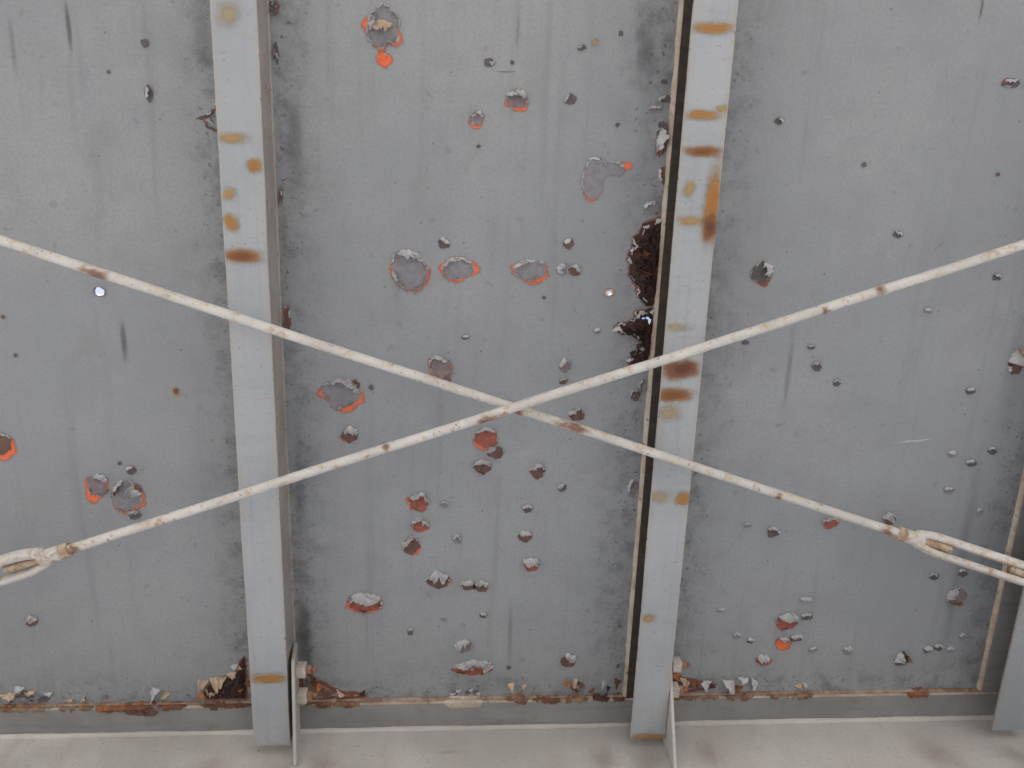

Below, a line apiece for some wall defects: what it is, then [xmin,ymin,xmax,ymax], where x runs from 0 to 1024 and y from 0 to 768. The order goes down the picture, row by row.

peeling [361,3,402,68]
rust [681,174,720,239]
rust [225,250,259,262]
peeling [390,237,480,292]
rust [612,217,662,365]
peeling [0,432,17,461]
peeling [84,462,146,520]
peeling [346,592,383,614]
peeling [775,596,817,653]
rust [0,686,187,717]
rust [195,657,284,711]
rust [672,672,813,702]